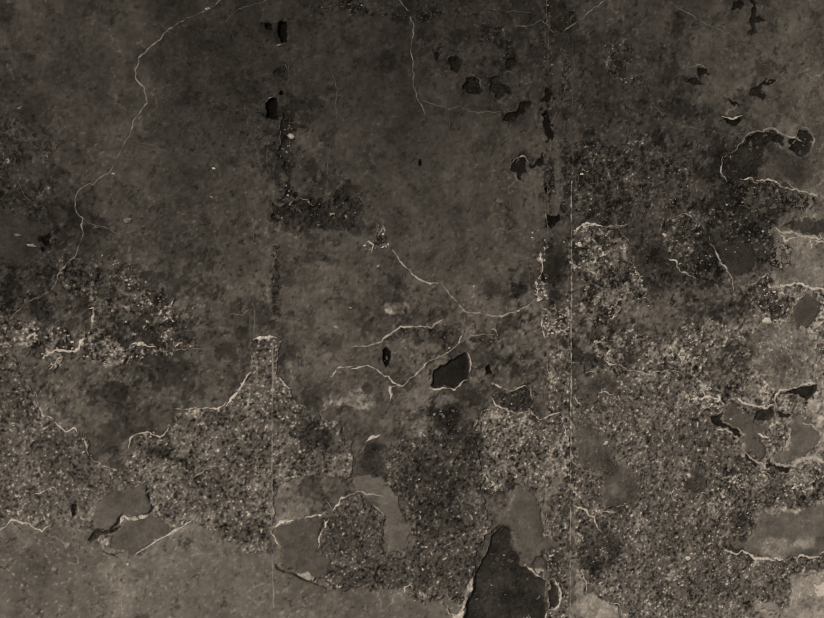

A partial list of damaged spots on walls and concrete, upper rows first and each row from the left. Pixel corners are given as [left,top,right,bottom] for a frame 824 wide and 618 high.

crack [399,0,501,144]
crack [485,0,605,123]
crack [11,0,266,318]
spalling [27,227,57,255]
spalling [0,253,356,561]
crack [333,362,427,400]
crack [392,250,535,342]
spalling [267,0,824,618]